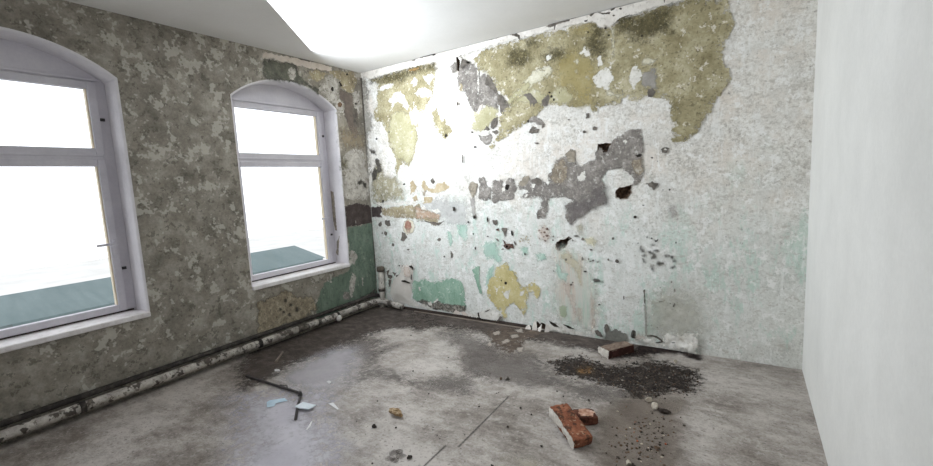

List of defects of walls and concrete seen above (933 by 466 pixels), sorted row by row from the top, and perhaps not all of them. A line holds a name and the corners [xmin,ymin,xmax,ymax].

peeling [256,0,735,354]